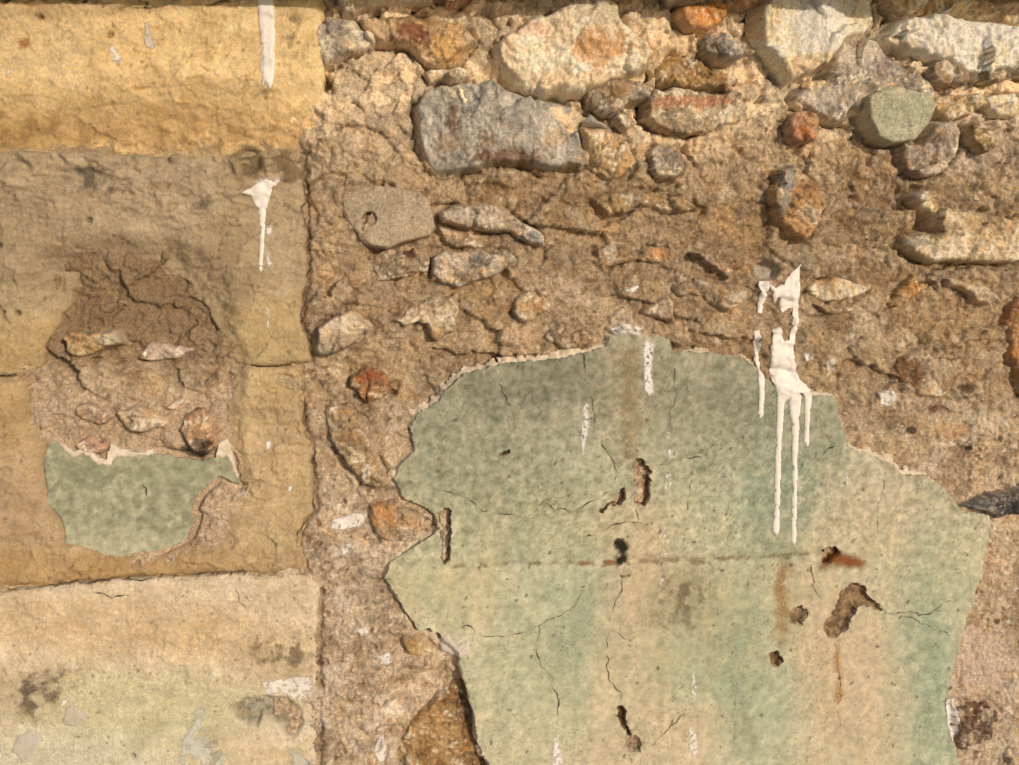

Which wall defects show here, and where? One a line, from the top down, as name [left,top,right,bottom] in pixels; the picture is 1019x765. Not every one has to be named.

spalling [599,458,651,512]
spalling [437,509,452,563]
spalling [789,605,808,625]
spalling [823,582,881,638]
spalling [769,650,783,667]
crack [606,639,680,760]
spalling [616,705,641,751]